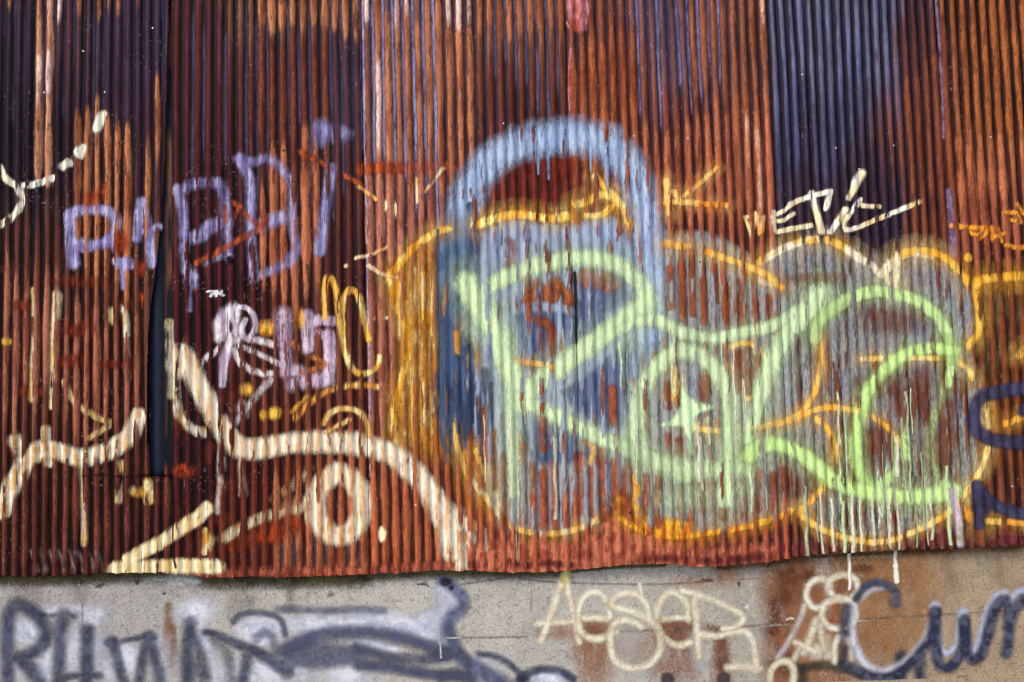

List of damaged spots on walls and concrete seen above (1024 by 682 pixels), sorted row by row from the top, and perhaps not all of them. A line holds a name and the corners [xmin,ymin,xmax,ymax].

corrosion [34,0,61,186]
corrosion [97,0,120,20]
corrosion [145,73,161,240]
corrosion [194,0,768,438]
corrosion [904,0,1024,271]
corrosion [3,97,145,568]
corrosion [826,360,843,450]
corrosion [873,337,900,437]
corrosion [978,288,1024,401]
corrosion [164,465,194,557]
corrosion [186,454,1024,682]